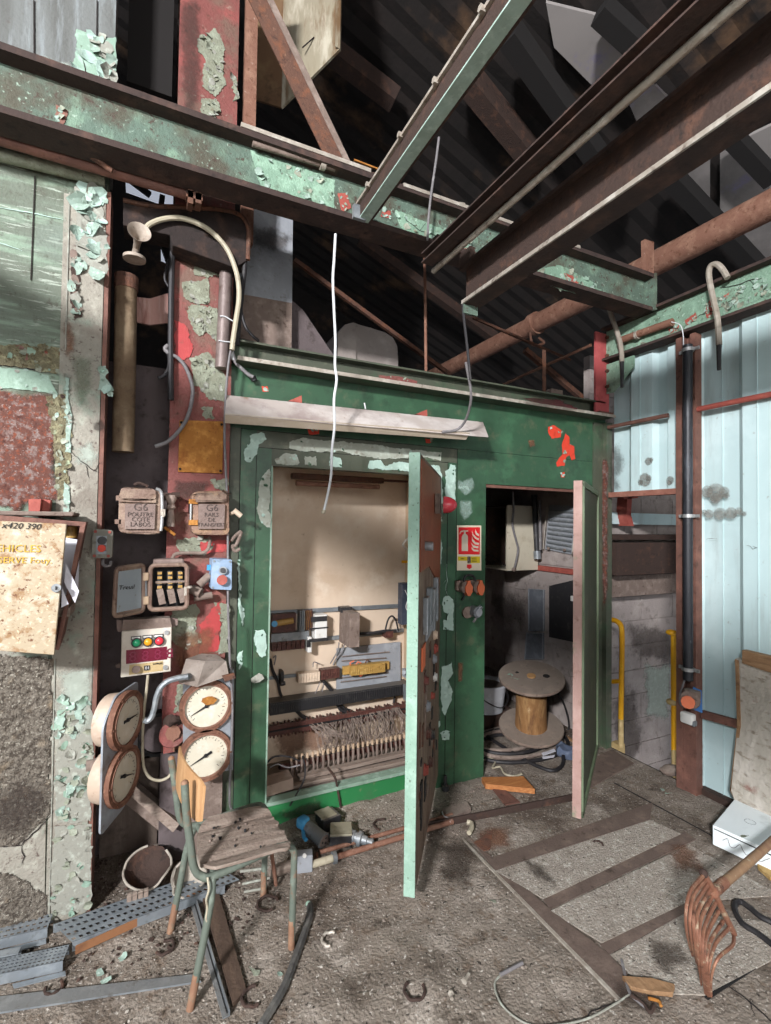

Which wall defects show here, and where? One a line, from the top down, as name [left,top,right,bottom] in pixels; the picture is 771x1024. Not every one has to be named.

peeling [70,29,118,83]
peeling [197,28,240,118]
peeling [66,181,111,319]
peeling [174,266,226,420]
peeling [630,273,771,348]
rust [0,391,58,511]
spalling [0,343,73,520]
damp [702,484,746,519]
peeling [48,694,94,920]